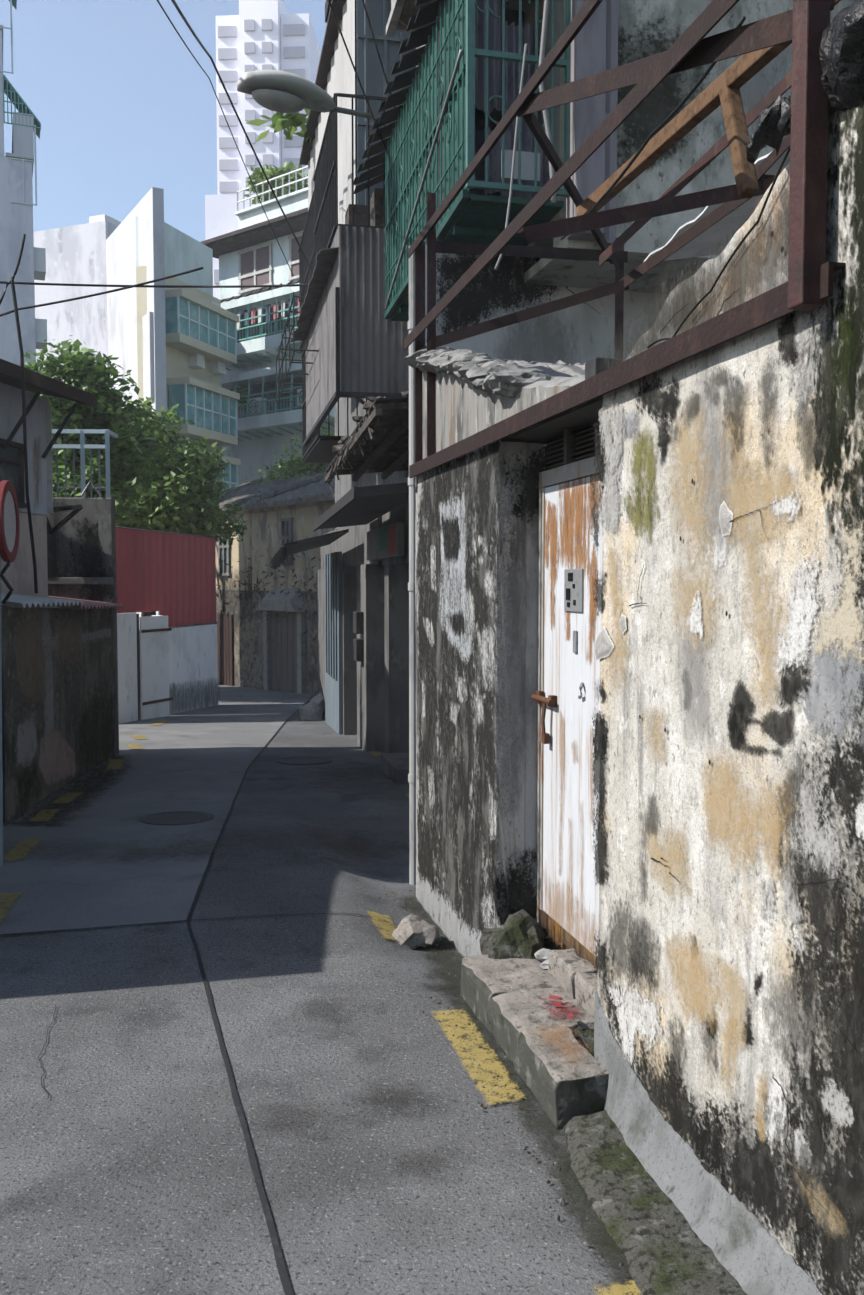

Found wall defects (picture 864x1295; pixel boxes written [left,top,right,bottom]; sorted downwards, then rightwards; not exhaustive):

leakage [618,17,680,66]
leakage [617,64,710,167]
rust [544,473,601,664]
leakage [416,440,547,940]
leakage [590,99,864,1295]